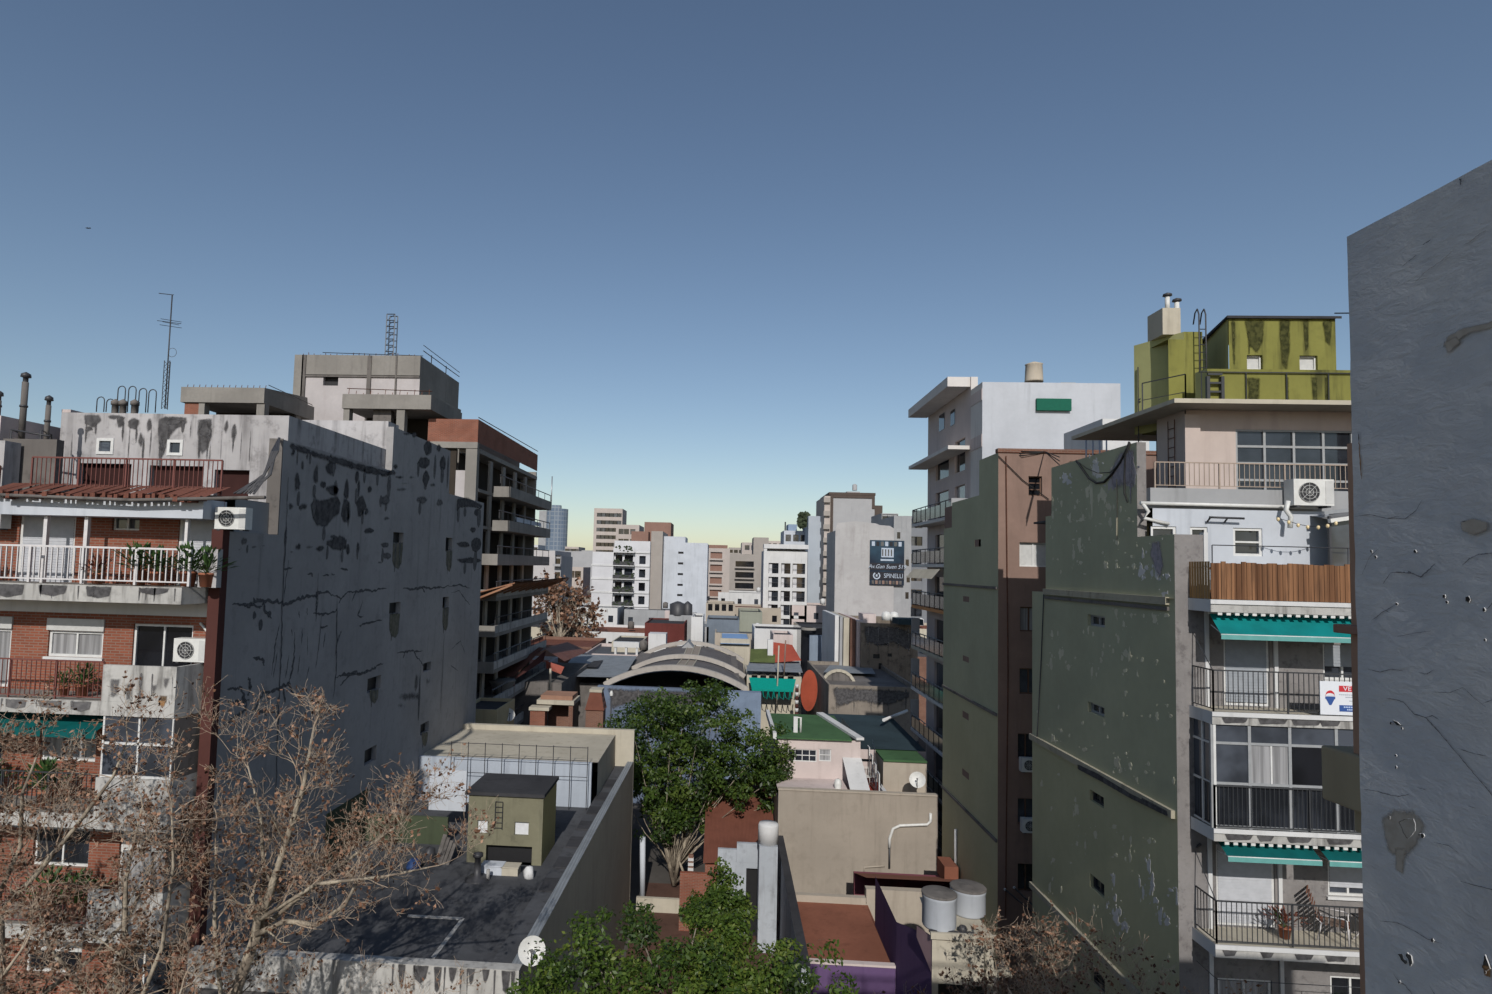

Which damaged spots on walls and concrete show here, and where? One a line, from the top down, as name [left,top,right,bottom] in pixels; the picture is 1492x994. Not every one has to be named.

damp [71,415,251,465]
damp [285,433,482,574]
crack [227,477,470,783]
peeling [1048,444,1173,782]
crack [1361,502,1492,808]
peeling [1048,797,1179,952]
damp [392,964,515,994]